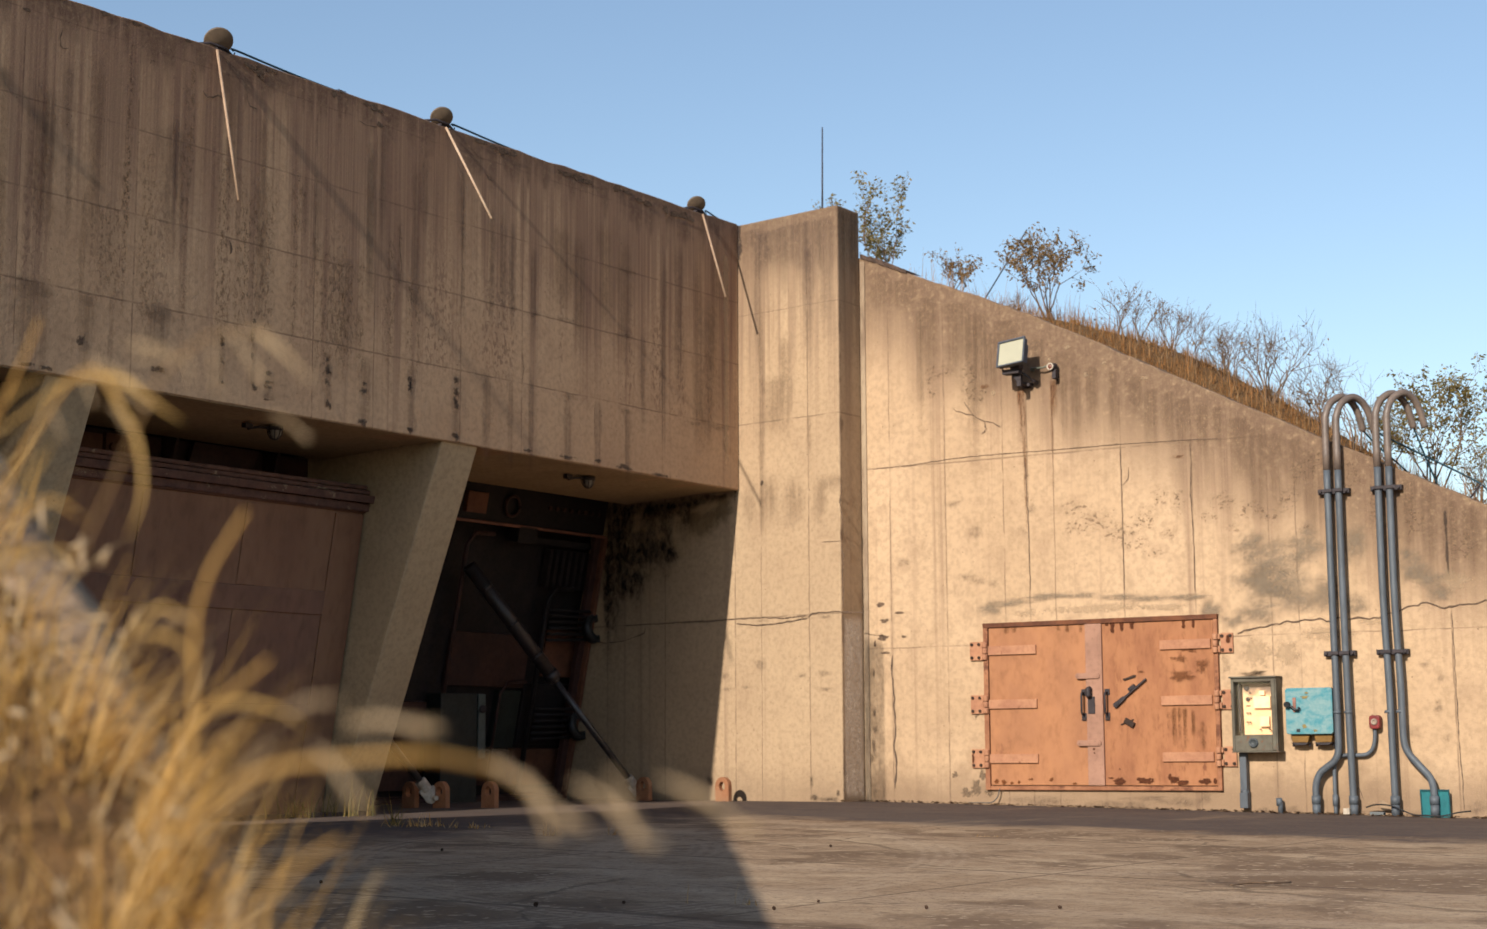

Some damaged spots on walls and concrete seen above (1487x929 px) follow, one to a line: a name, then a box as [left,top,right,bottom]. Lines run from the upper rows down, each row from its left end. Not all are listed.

rust [1171,649,1208,681]
crack [1237,599,1486,811]
rust [1108,768,1217,785]